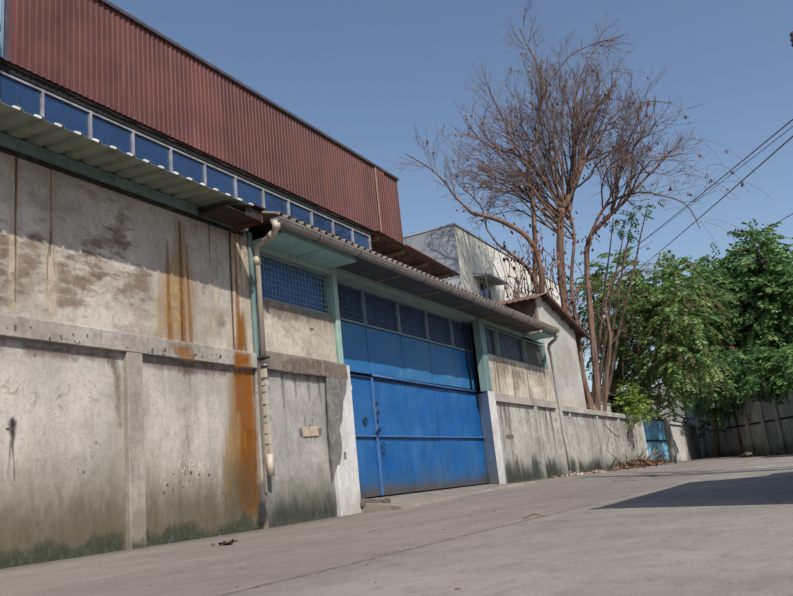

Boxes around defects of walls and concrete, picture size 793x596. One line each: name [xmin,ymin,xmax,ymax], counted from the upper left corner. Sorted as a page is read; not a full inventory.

corrosion [160,230,192,358]
corrosion [227,232,259,516]